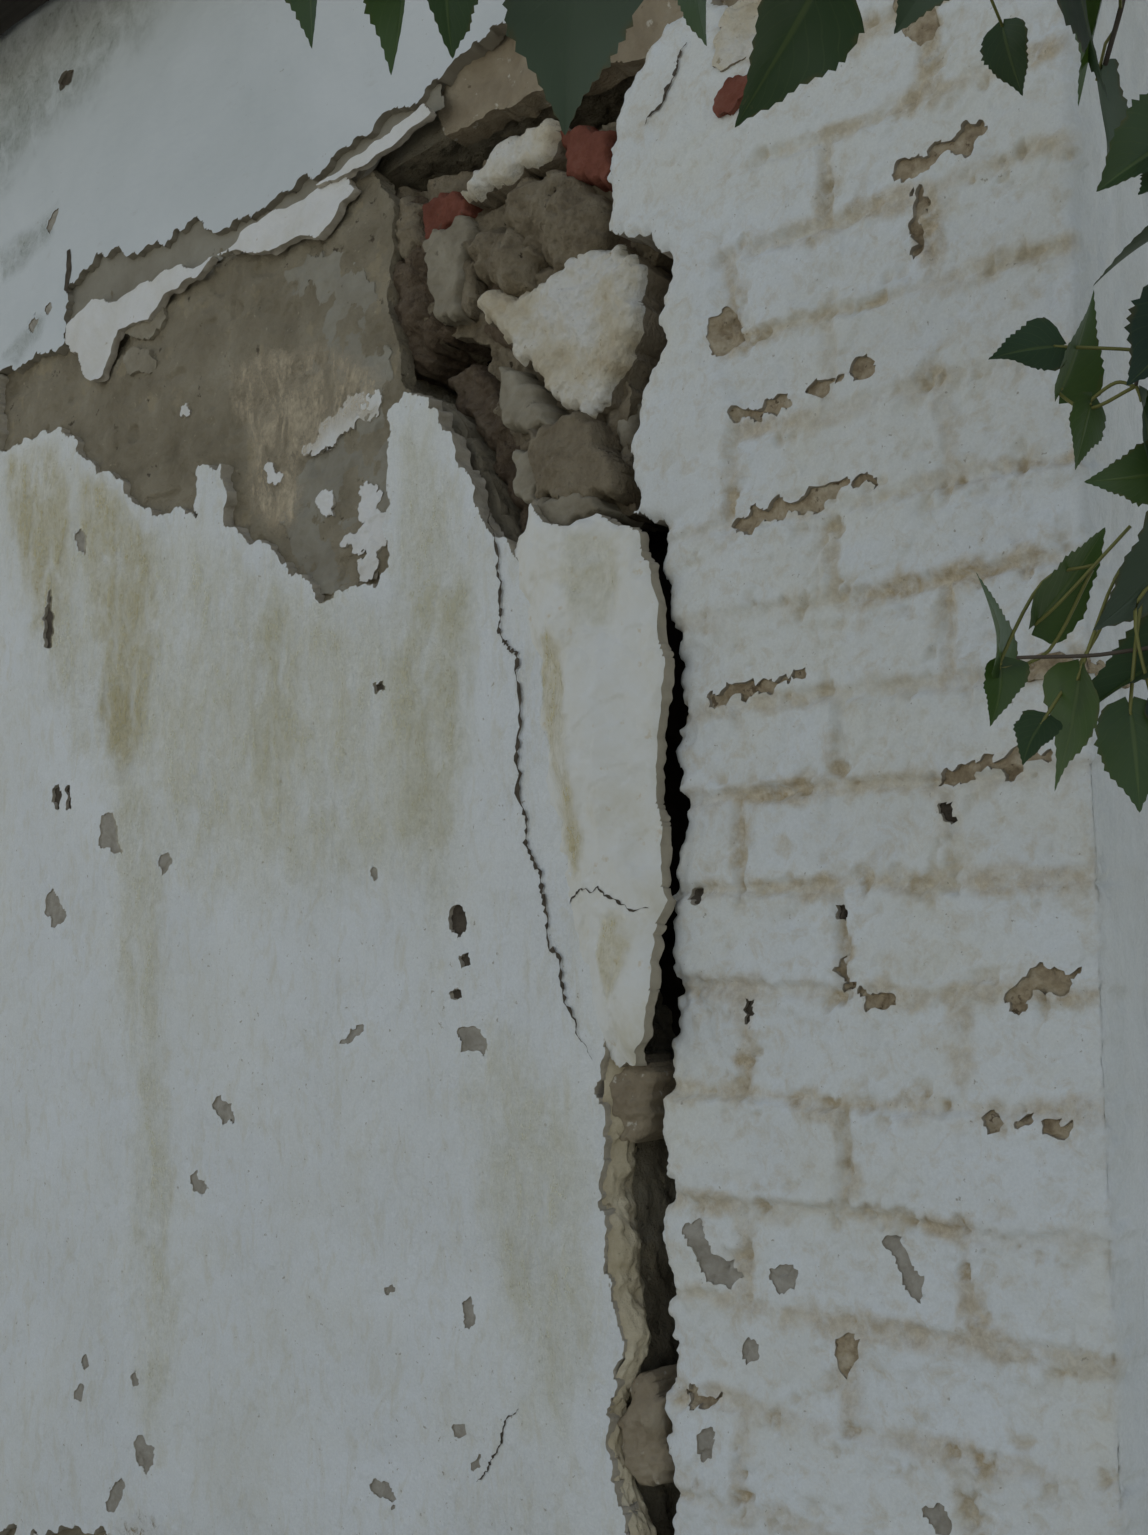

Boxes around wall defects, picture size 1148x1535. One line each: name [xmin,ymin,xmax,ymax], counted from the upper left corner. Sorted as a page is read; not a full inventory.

flaking render [712,0,761,118]
peeling [3,104,436,602]
spalling [707,306,747,357]
water stain [241,356,374,522]
flaking render [100,813,123,854]
crack [487,497,677,1535]
spalling [683,1218,744,1289]
spalling [770,1264,798,1294]
spalling [883,1235,924,1303]
spalling [836,1332,860,1377]
spalling [698,1427,715,1462]
spalling [924,1503,952,1535]